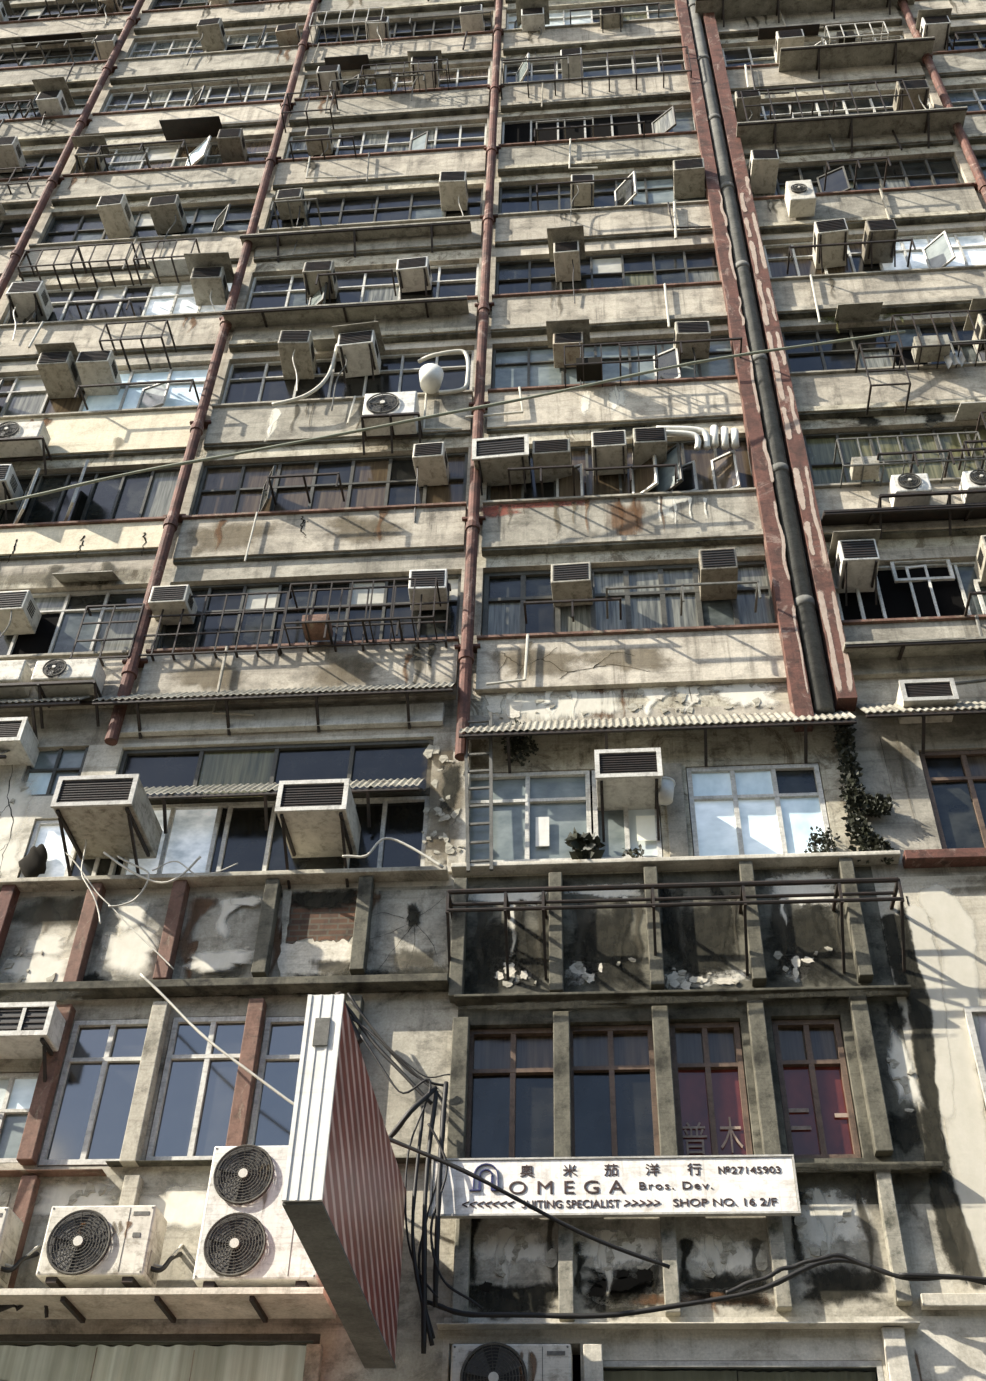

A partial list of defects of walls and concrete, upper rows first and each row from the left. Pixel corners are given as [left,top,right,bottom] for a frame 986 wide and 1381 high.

corrosion [611,497,643,535]
damp [412,643,436,684]
crack [550,648,648,679]
peeling [483,682,778,721]
flaking render [1,934,69,983]
flaking render [103,900,155,977]
flaking render [188,896,260,972]
spalling [277,889,358,977]
crack [371,899,442,967]
peeling [494,960,537,988]
peeling [665,967,746,990]
flaking render [793,1188,870,1269]